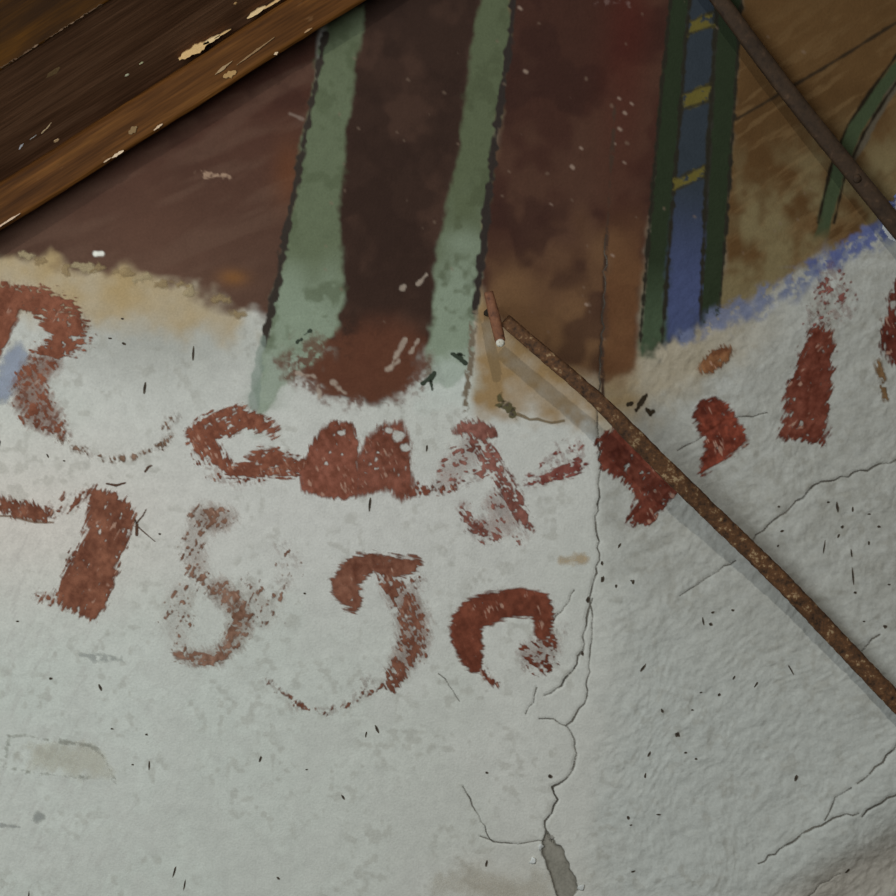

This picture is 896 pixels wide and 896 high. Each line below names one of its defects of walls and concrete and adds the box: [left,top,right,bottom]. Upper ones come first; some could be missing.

peeling [62,262,194,296]
crack [754,459,896,538]
crack [467,416,602,844]
crack [758,747,896,864]
flaking render [529,830,584,896]